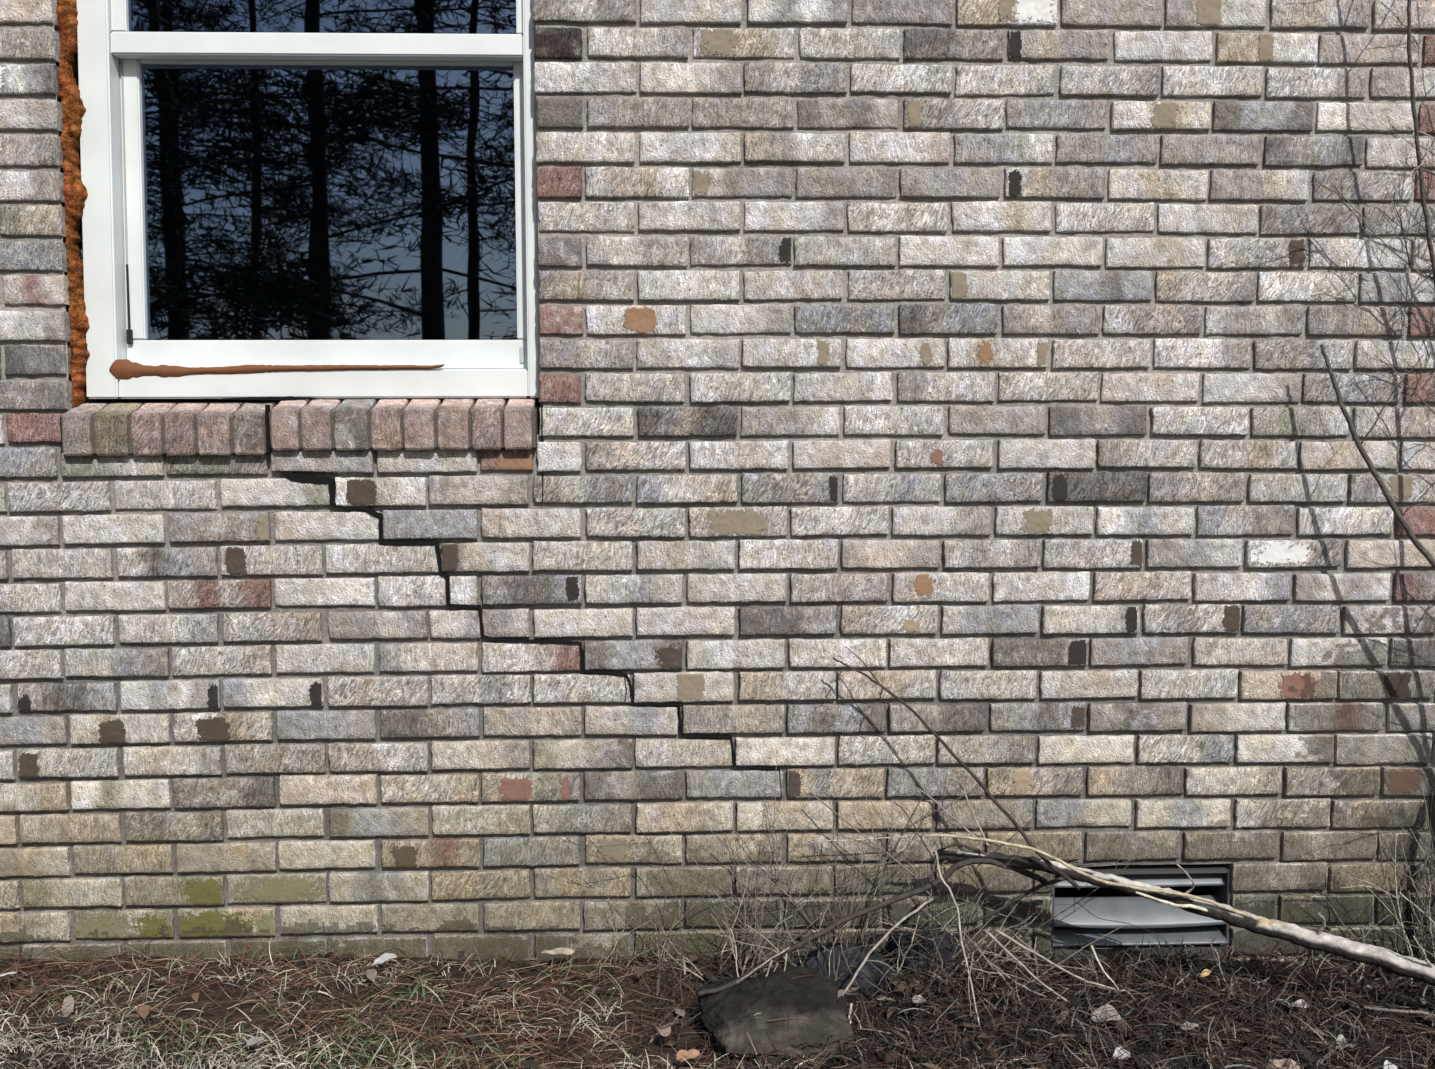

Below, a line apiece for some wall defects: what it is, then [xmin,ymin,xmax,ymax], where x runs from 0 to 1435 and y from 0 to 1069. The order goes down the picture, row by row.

crack [214,396,782,799]